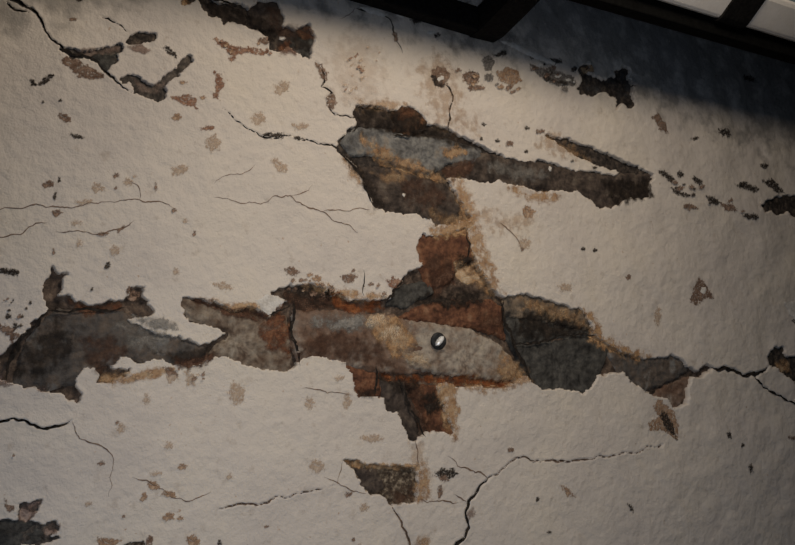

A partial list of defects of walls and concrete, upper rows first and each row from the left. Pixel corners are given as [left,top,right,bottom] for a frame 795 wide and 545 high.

crack [6,0,132,93]
flaking render [59,32,156,80]
flaking render [181,0,329,81]
flaking render [431,41,634,109]
flaking render [0,105,795,441]
rust [430,179,499,296]
crack [711,366,795,404]
flaking render [0,498,60,545]
crack [0,418,114,497]
crack [222,465,365,509]
flaking render [344,459,417,505]
crack [421,445,661,545]